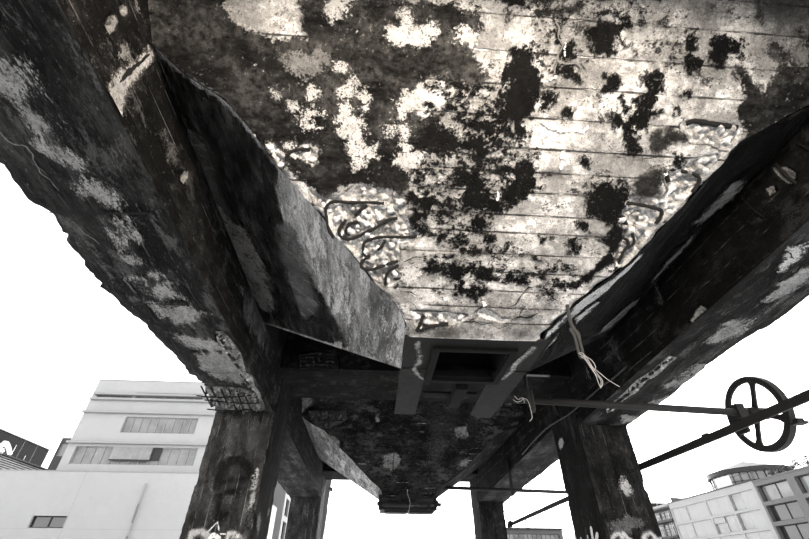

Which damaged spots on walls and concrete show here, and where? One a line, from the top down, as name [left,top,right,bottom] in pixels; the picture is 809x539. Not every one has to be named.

damp [0,47,250,385]
damp [237,276,266,352]
damp [275,223,320,318]
damp [703,266,809,345]
spalling [196,331,266,414]
spalling [606,356,676,413]